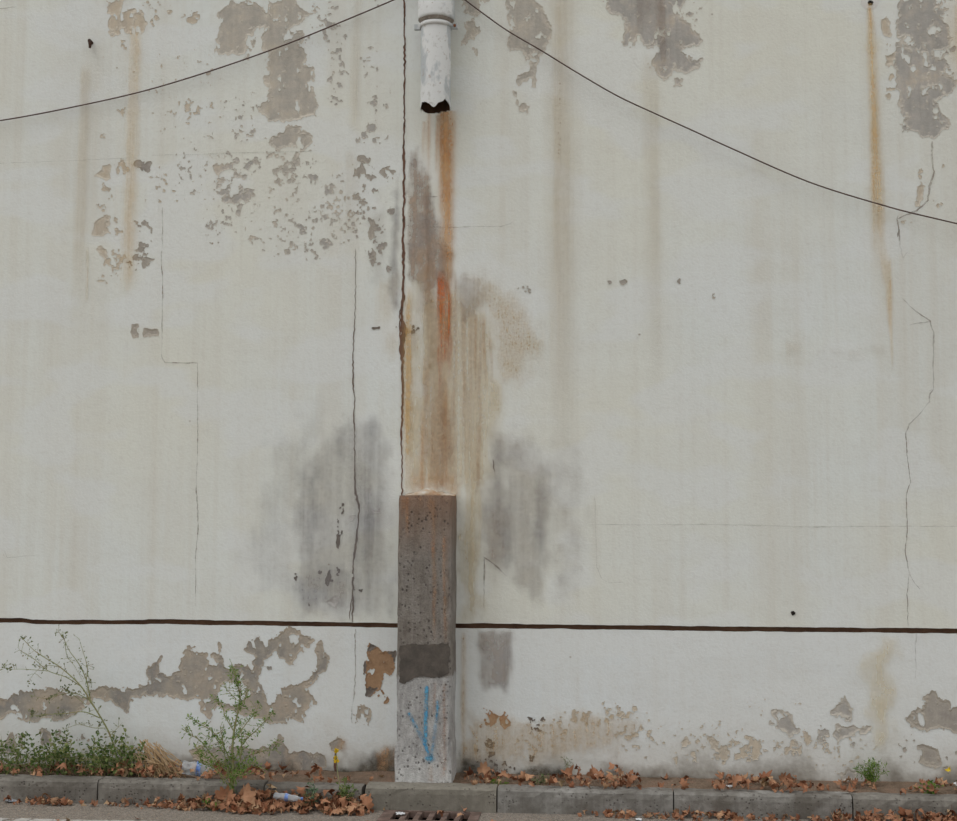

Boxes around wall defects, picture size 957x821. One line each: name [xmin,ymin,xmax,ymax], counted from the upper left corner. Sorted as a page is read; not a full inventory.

peeling [461,0,490,56]
peeling [505,0,552,114]
peeling [603,0,703,87]
peeling [880,0,957,139]
peeling [91,0,396,284]
corrosion [442,112,451,259]
corrosion [438,276,450,353]
crack [349,250,360,683]
crack [905,427,919,619]
peeling [0,626,345,770]
flaking render [353,643,397,726]
peeling [898,690,957,775]